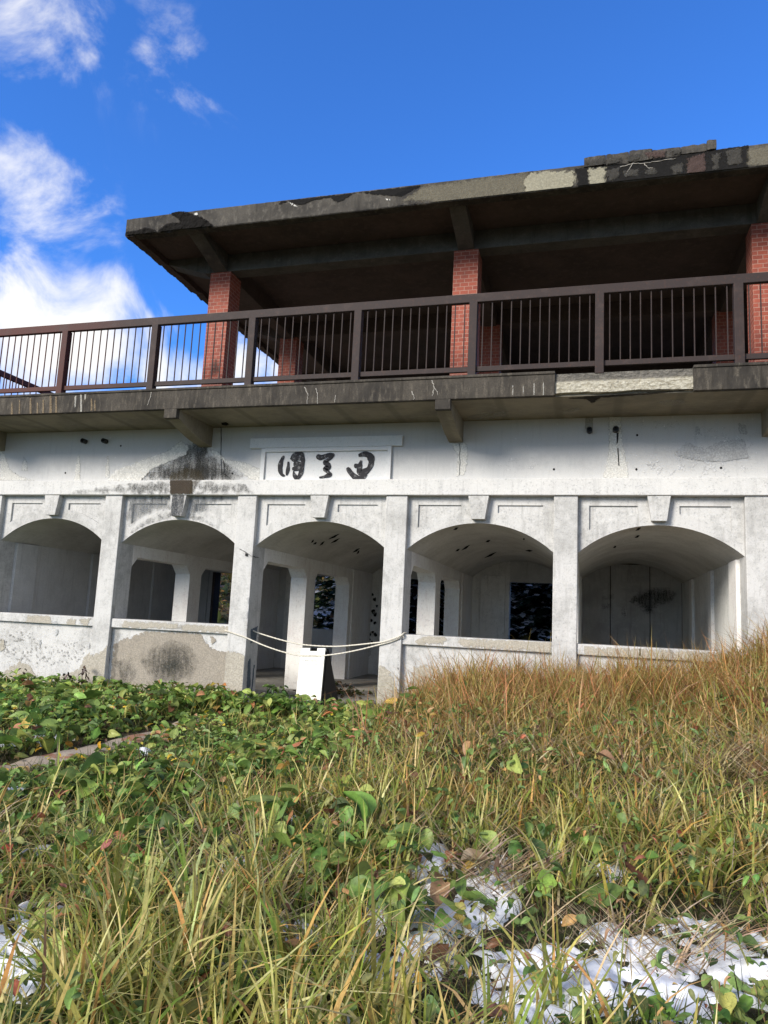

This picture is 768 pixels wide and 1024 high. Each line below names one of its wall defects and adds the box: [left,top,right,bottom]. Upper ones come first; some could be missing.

peeling [279,145,768,206]
crack [620,158,676,172]
peeling [675,423,748,462]
water stain [102,441,260,533]